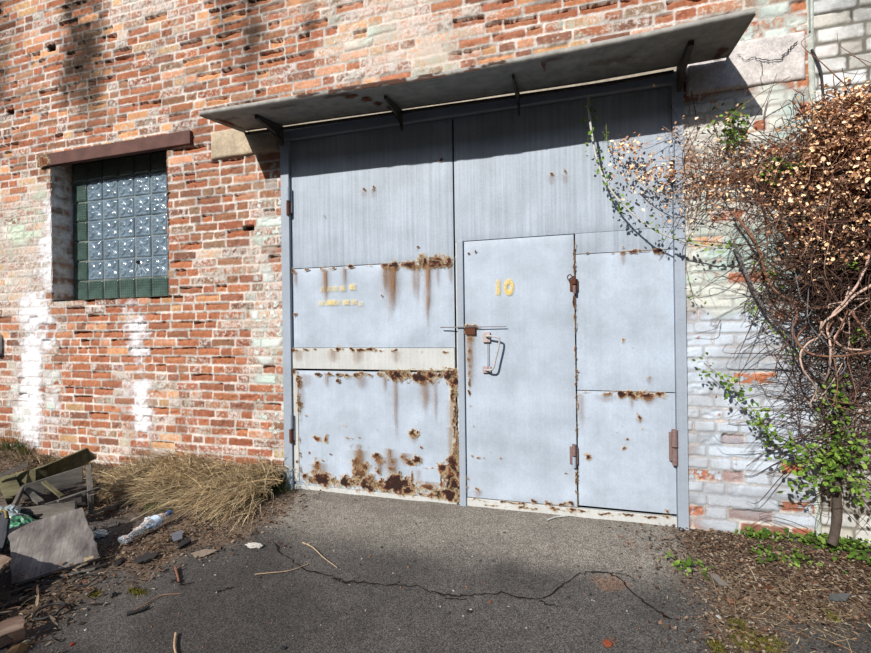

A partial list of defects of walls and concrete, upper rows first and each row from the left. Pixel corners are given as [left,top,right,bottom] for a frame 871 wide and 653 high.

rust [370,246,452,313]
efflorescence [14,194,61,447]
efflorescence [119,301,154,440]
rust [292,369,307,416]
rust [296,324,585,513]
rust [603,390,667,401]
crack [275,543,672,619]